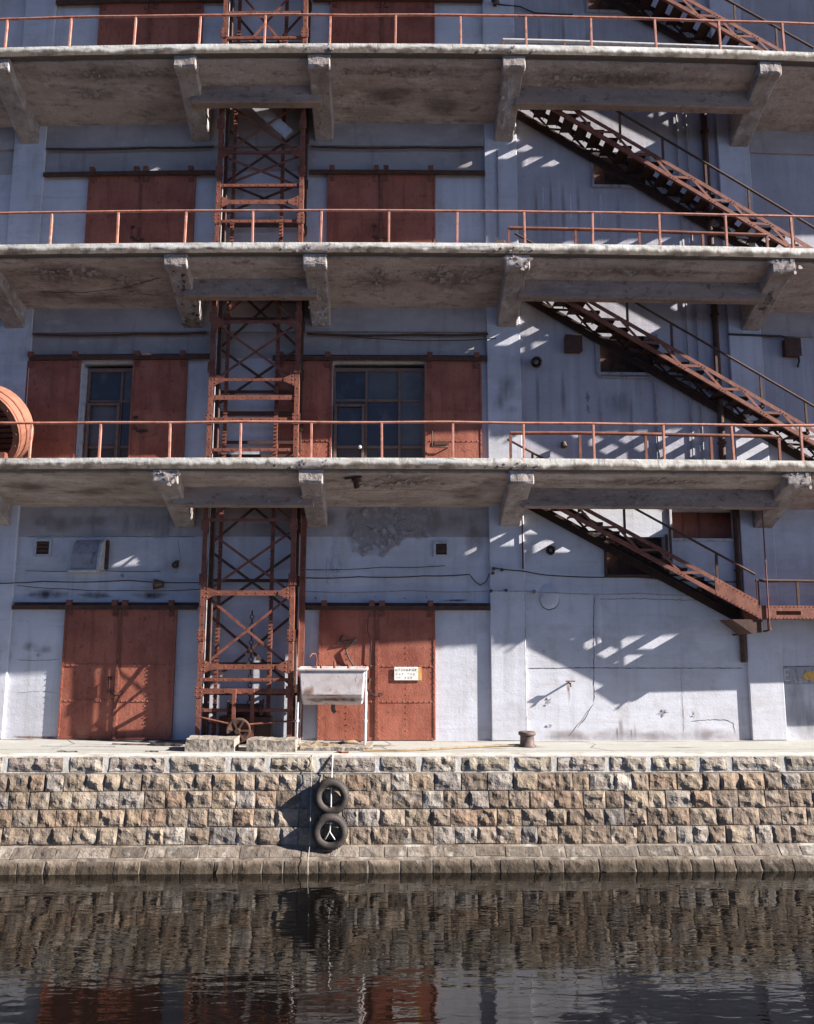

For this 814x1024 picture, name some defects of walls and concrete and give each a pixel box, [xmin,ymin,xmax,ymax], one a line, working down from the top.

peeling [349,506,436,558]
crack [525,598,685,751]